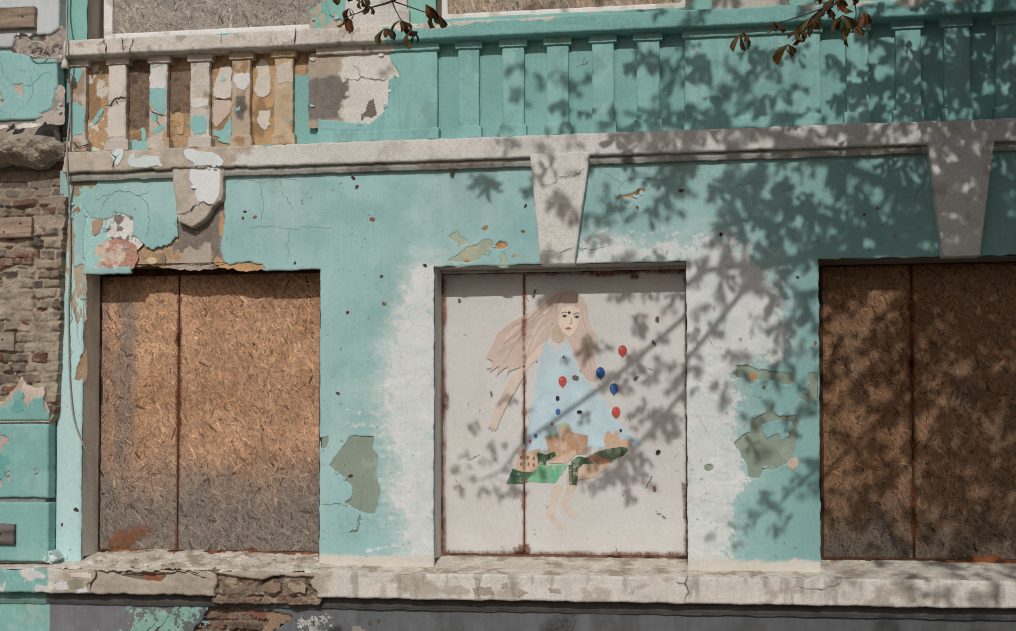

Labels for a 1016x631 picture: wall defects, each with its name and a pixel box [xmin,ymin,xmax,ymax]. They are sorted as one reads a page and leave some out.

flaking render [0,26,399,427]
peeling [448,225,516,268]
peeling [736,365,817,403]
peeling [0,435,10,486]
peeling [734,405,799,478]
peeling [330,435,381,533]
corrosion [107,527,150,552]
corrosion [203,547,319,555]
peeling [54,572,92,593]
spalling [119,567,332,631]
peeling [473,582,528,597]